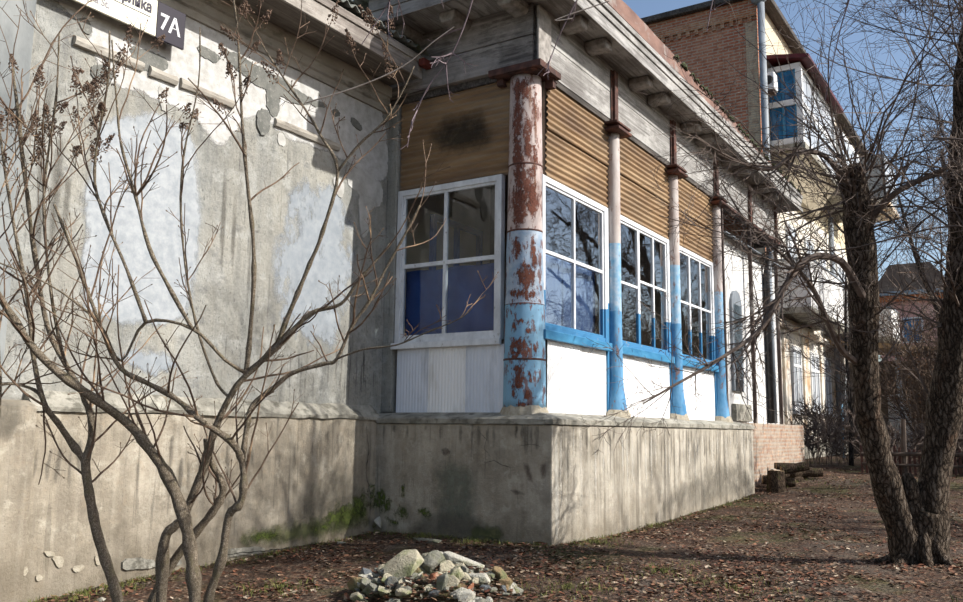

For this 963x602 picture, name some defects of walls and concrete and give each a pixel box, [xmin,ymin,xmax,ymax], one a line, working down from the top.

peeling [56,0,388,238]
corrosion [510,76,542,306]
corrosion [511,318,537,407]
damp [525,443,558,529]